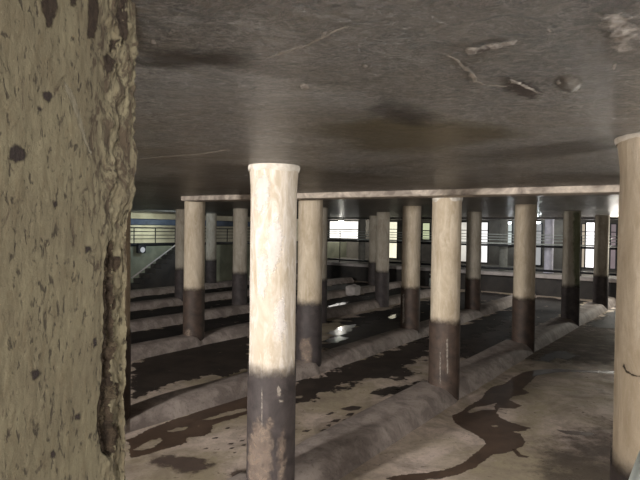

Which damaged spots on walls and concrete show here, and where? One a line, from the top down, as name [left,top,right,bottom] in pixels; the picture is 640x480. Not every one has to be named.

spalling [465,40,517,55]
crack [446,55,507,87]
spalling [505,77,543,99]
spalling [93,241,121,457]
damp [123,260,616,480]